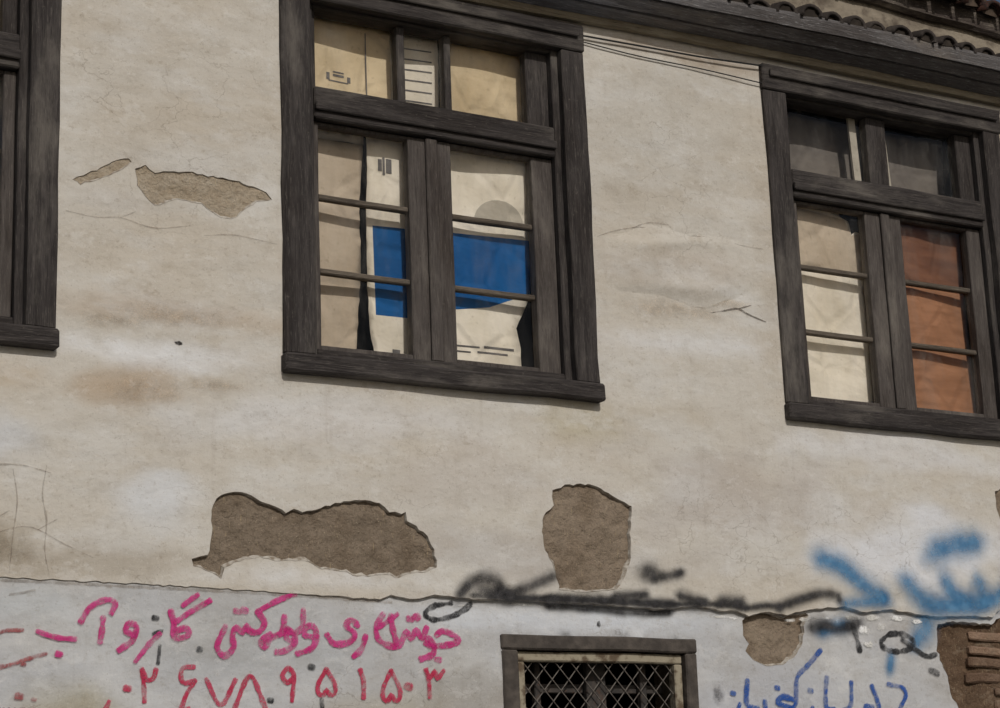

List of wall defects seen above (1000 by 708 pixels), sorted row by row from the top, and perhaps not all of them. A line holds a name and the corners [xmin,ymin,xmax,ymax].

peeling [73,158,272,219]
crack [713,305,766,322]
flaking render [192,492,437,579]
flaking render [542,483,632,592]
flaking render [714,613,809,666]
peeling [822,615,922,647]
flaking render [936,618,1000,708]